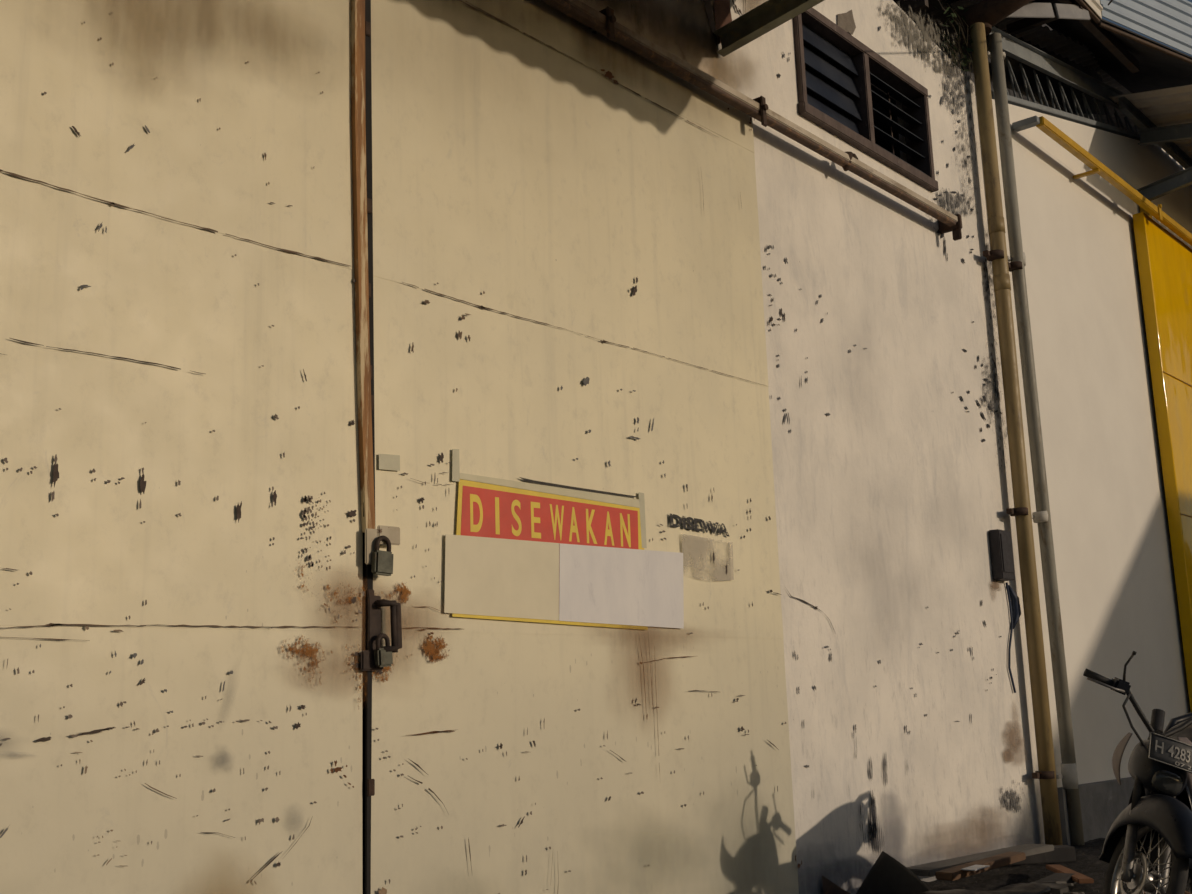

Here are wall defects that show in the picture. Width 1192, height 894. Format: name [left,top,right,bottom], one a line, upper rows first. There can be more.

leakage [879,4,981,222]
leakage [982,232,1007,470]
corrosion [388,582,411,603]
corrosion [281,636,394,707]
corrosion [421,634,447,662]